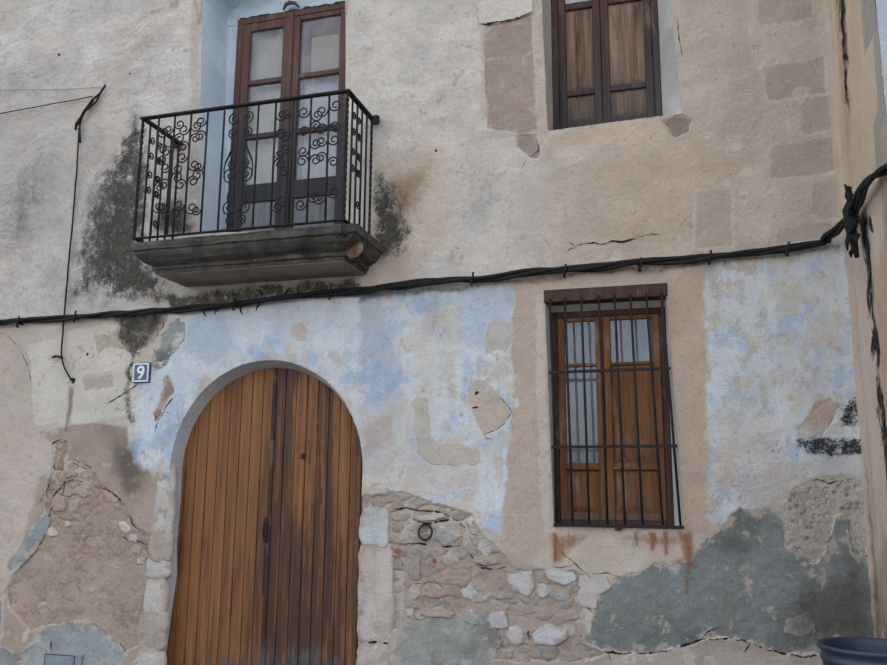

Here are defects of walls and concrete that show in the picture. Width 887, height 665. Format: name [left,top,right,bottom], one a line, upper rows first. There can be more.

flaking render [662,113,692,138]
leakage [73,117,400,307]
leakage [373,175,410,256]
crack [568,234,659,251]
leakage [115,315,160,423]
flaking render [468,381,514,439]
flaking render [798,397,840,439]
rust [553,533,575,561]
rust [679,533,692,568]
peeling [578,475,874,656]
peeling [394,610,502,665]
crack [590,627,820,660]